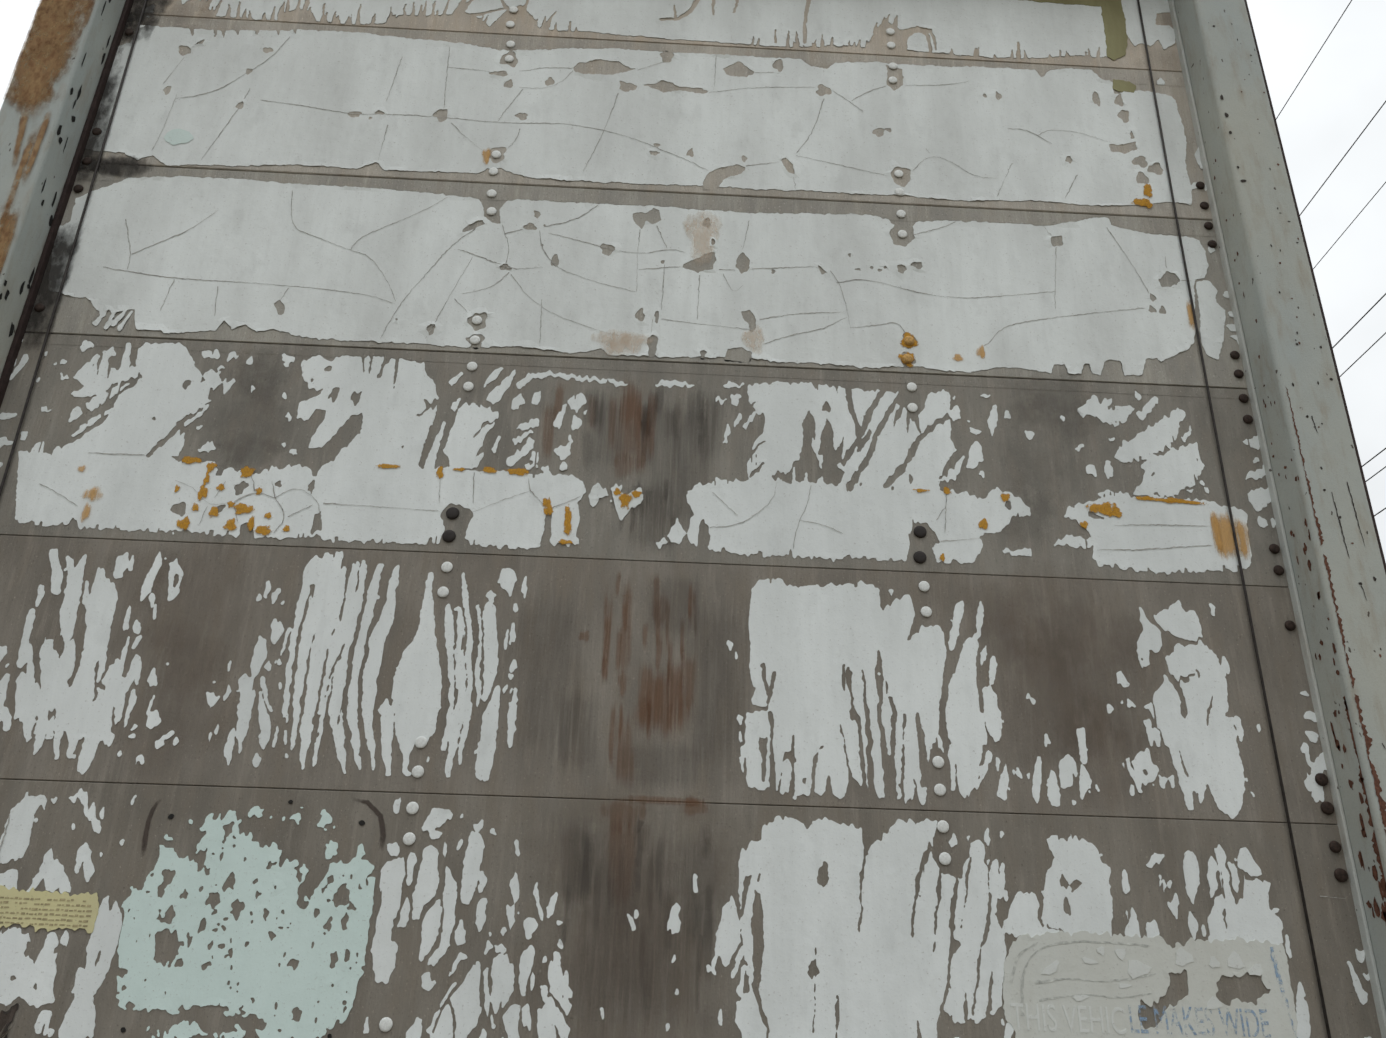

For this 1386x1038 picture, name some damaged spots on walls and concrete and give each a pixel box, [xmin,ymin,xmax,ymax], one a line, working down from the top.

rust [0,0,93,271]
crack [151,37,708,171]
crack [746,81,1012,196]
crack [106,190,1187,346]
rust [176,456,290,535]
peeling [0,267,1311,782]
rust [1136,496,1248,556]
peeling [0,549,183,894]
peeling [0,806,573,1038]
peeling [706,578,1160,1038]
peeling [1107,600,1261,819]
rust [1286,388,1386,898]